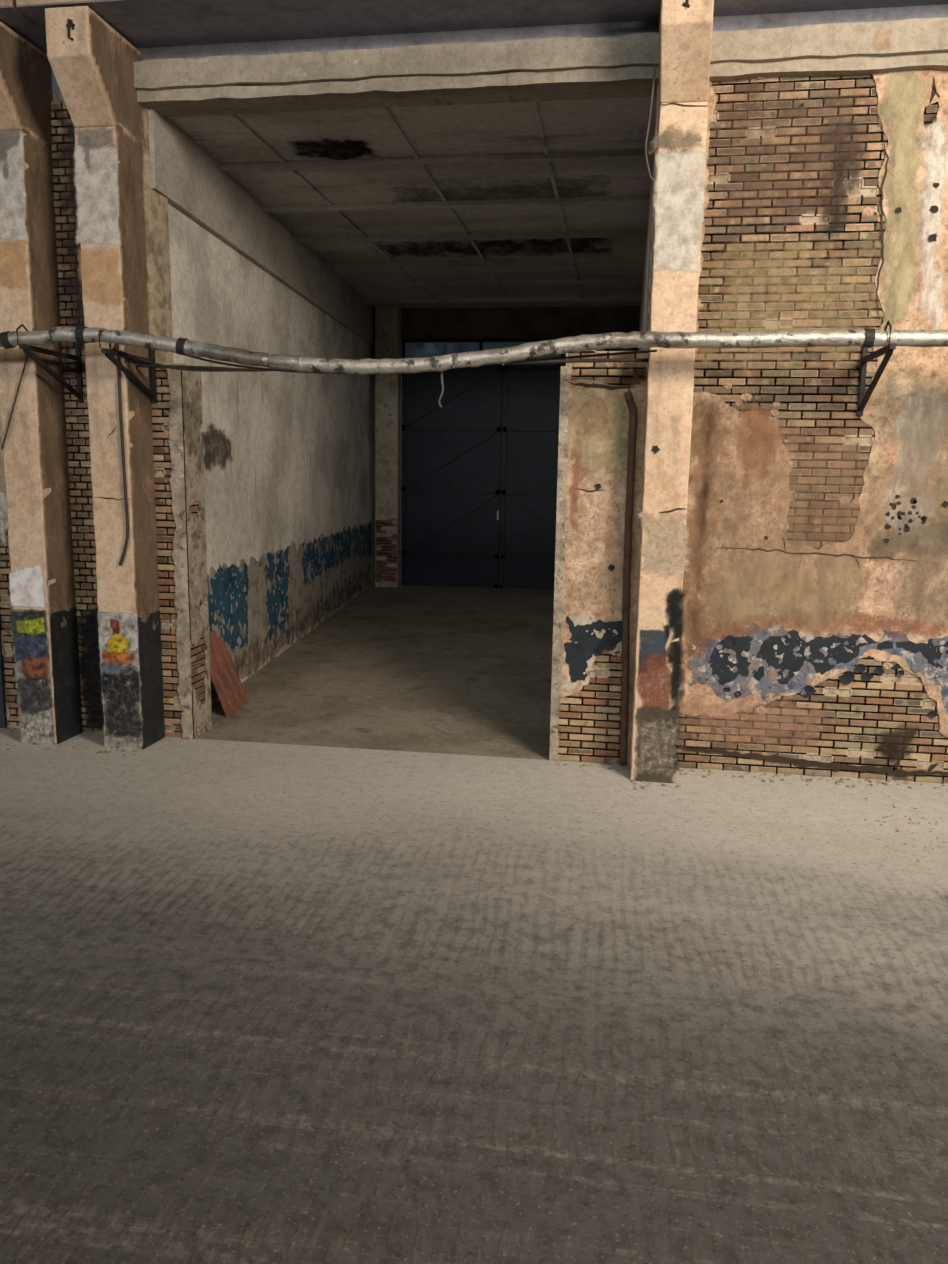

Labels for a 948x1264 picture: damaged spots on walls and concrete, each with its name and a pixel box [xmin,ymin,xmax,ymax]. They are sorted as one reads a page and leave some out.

spalling [697,74,902,333]
peeling [166,364,398,739]
spalling [549,350,648,764]
spalling [693,346,877,551]
spalling [675,623,948,784]